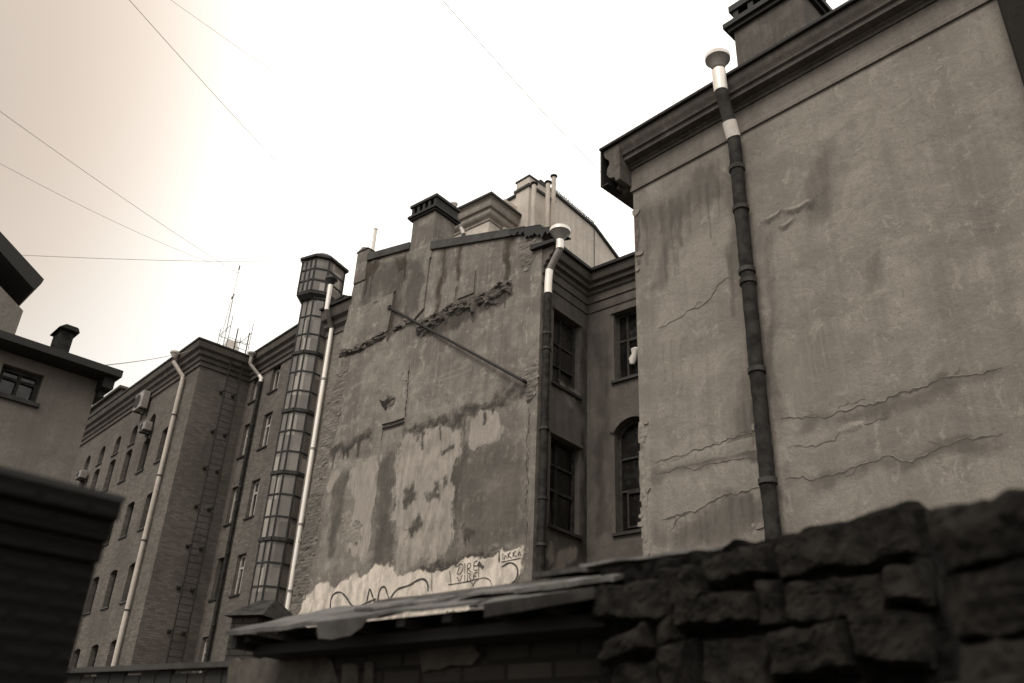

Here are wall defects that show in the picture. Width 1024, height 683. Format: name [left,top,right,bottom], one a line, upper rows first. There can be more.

crack [662,277,730,327]
crack [780,362,1002,448]
spalling [290,280,513,615]
crack [654,430,757,474]
crack [786,434,1001,481]
crack [662,486,760,530]